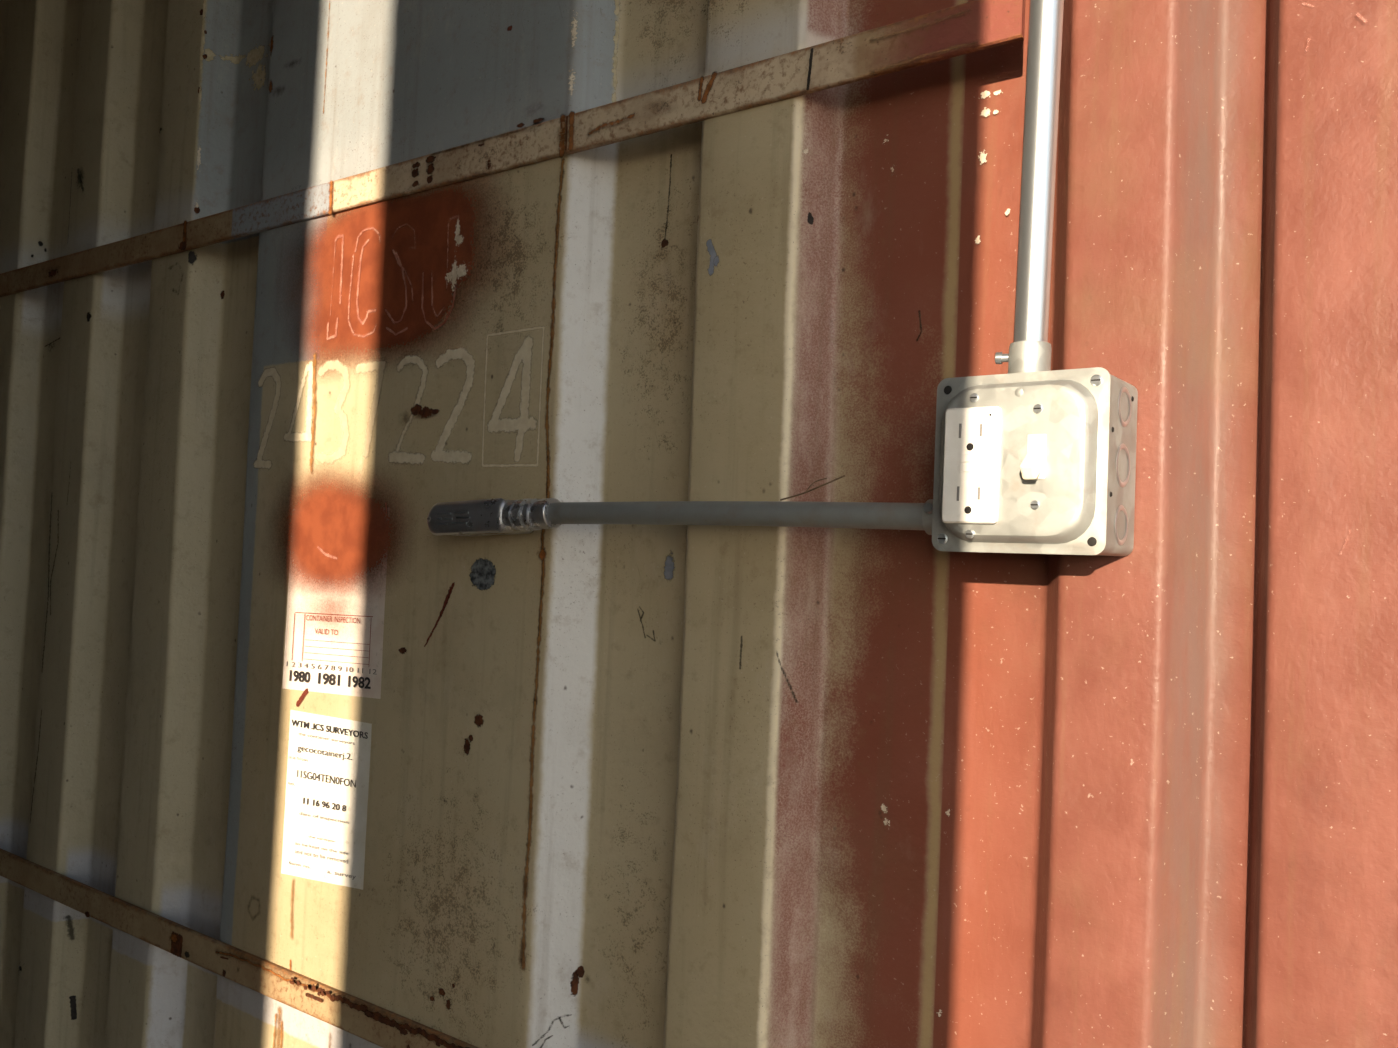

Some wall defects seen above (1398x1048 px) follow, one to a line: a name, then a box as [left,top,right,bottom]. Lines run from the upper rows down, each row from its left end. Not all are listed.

corrosion [697,72,717,104]
corrosion [464,714,484,755]
corrosion [65,912,90,940]
corrosion [170,932,190,958]
corrosion [570,966,585,997]
corrosion [69,996,77,1020]
corrosion [216,951,470,1048]